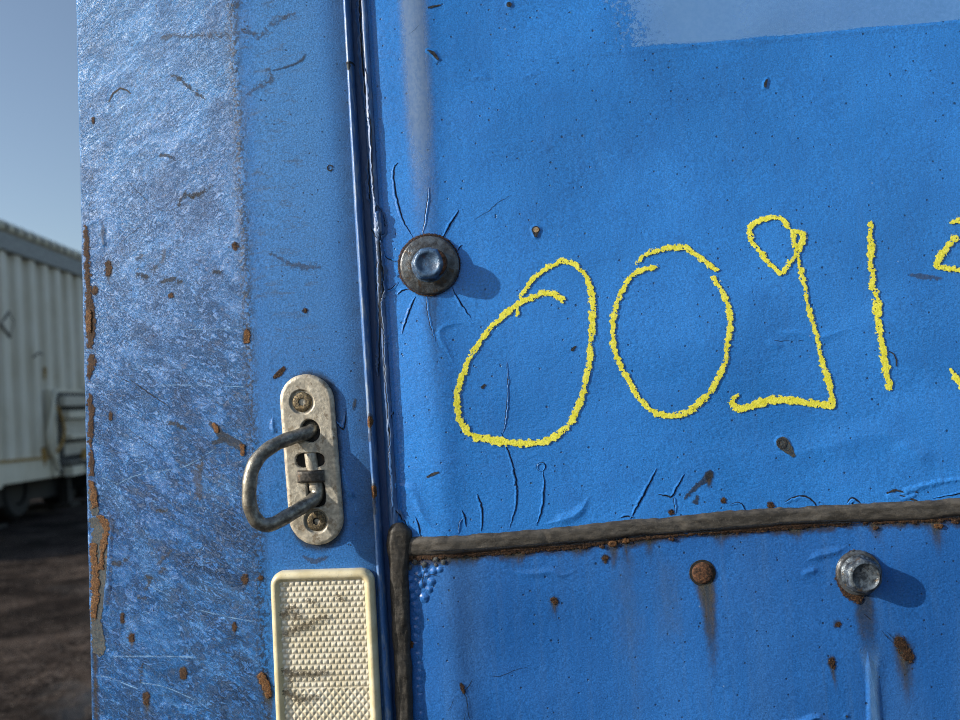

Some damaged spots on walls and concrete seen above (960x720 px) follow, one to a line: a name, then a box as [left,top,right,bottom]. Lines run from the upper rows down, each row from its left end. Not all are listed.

rust [82,225,98,477]
rust [409,516,960,565]
rust [698,580,714,637]
rust [885,632,915,680]
rust [257,672,272,708]